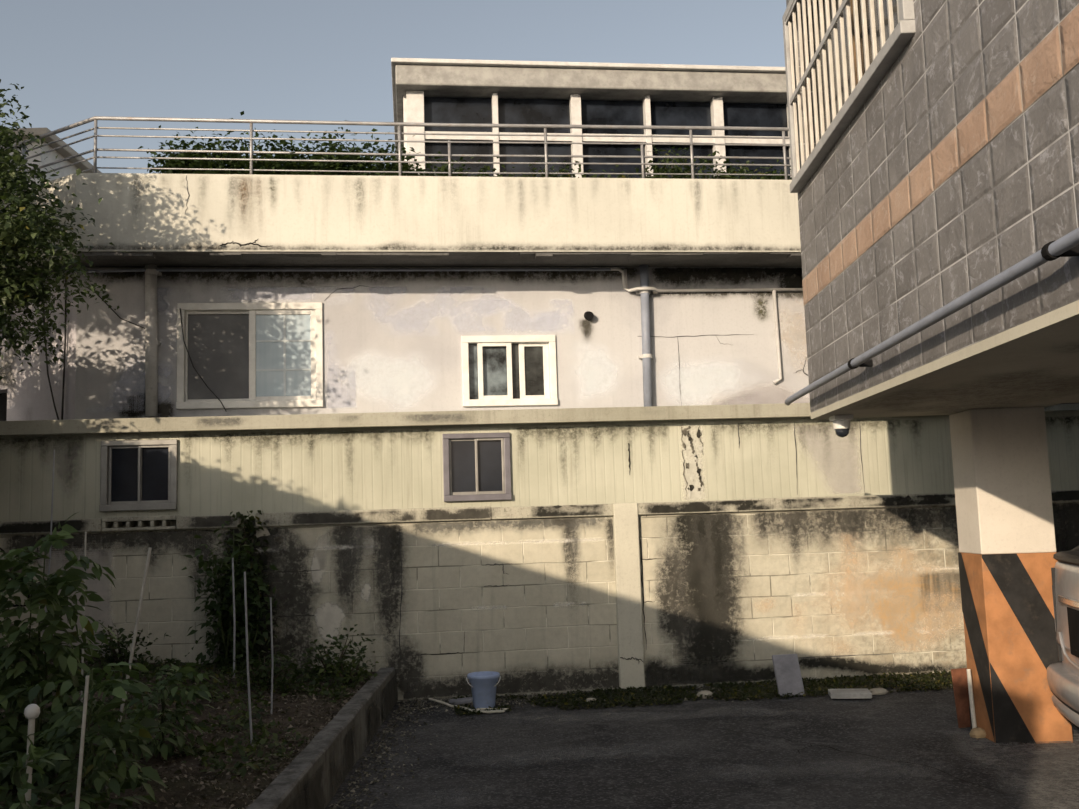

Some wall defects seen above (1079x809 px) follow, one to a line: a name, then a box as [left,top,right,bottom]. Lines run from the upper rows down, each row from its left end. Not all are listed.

water stain [231,178,249,211]
water stain [0,351,13,387]
water stain [195,430,428,449]
peeling [681,425,704,500]
water stain [713,420,917,493]
water stain [753,507,958,553]
water stain [6,528,320,669]
water stain [332,518,619,699]
water stain [644,513,776,686]
water stain [798,656,964,674]